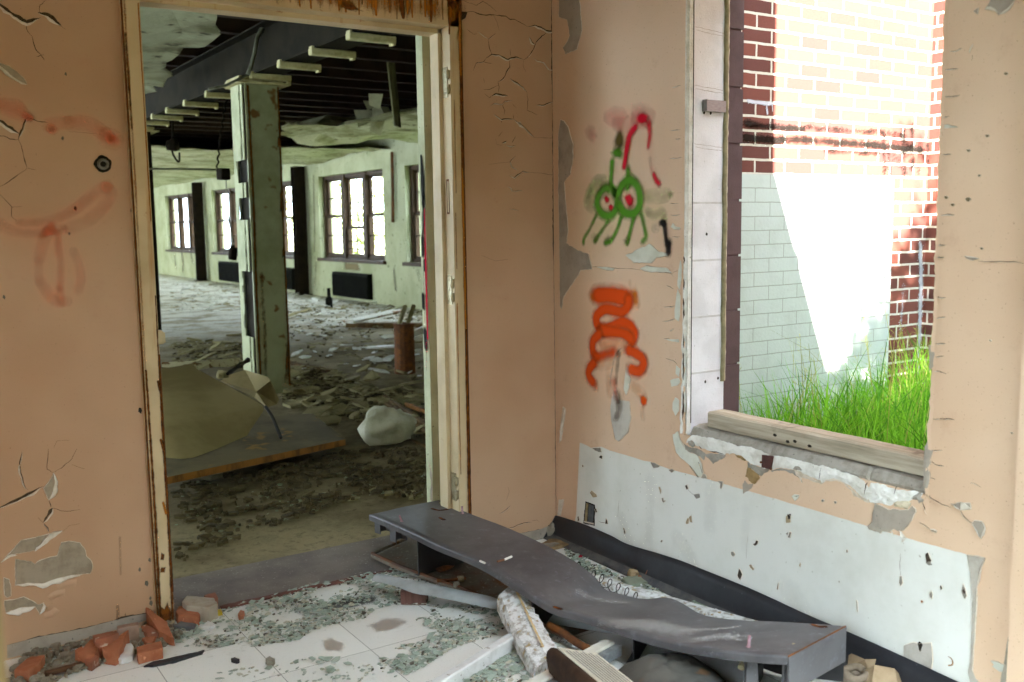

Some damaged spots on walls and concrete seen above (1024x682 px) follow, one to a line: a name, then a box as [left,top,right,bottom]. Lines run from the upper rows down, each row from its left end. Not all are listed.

crack [0,0,65,59]
peeling [558,0,582,54]
crack [0,118,43,217]
peeling [354,93,402,136]
crack [465,0,554,264]
peeling [558,120,615,309]
flaking render [626,0,971,543]
crack [0,440,84,532]
peeling [950,502,986,539]
peeling [1,531,93,616]
peeling [7,558,155,658]